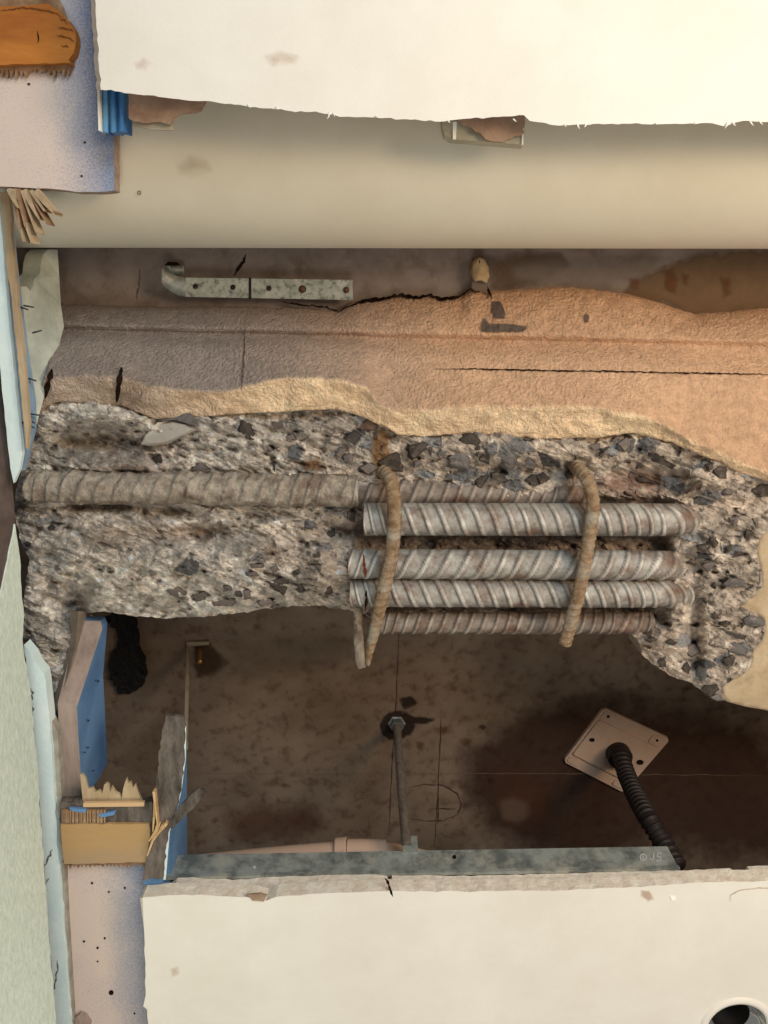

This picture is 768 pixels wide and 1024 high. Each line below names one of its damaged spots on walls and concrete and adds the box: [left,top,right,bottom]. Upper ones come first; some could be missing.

crack [284,286,492,311]
damp [493,250,768,314]
crack [435,367,768,375]
spalling [14,401,768,701]